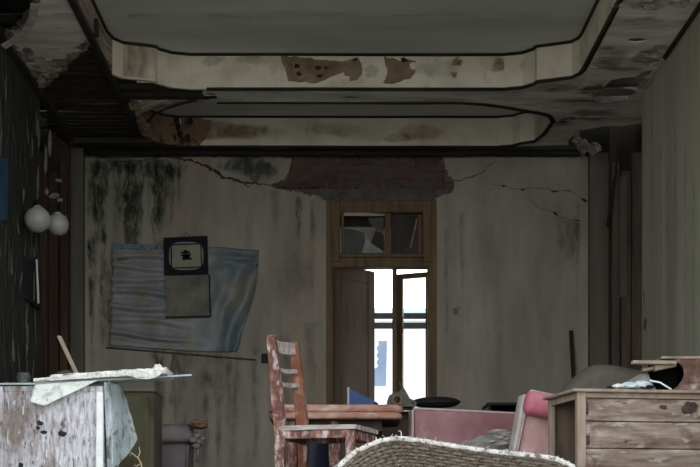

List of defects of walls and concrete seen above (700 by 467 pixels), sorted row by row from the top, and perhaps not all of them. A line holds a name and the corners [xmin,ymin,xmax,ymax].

flaking render [0,13,213,202]
peeling [281,56,363,84]
peeling [383,56,416,84]
leakage [93,160,180,244]
crack [166,156,270,187]
flaking render [270,156,454,202]
crack [454,160,587,235]
peeling [0,301,36,383]